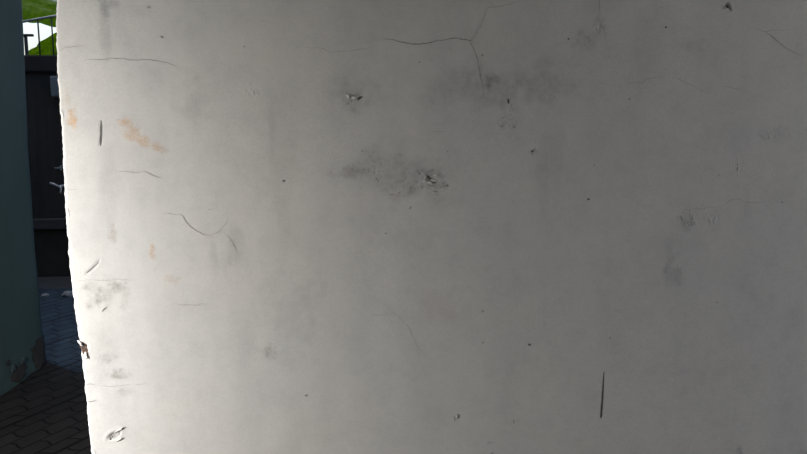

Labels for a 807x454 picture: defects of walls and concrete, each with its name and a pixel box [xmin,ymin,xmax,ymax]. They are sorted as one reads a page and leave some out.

crack [305,0,521,82]